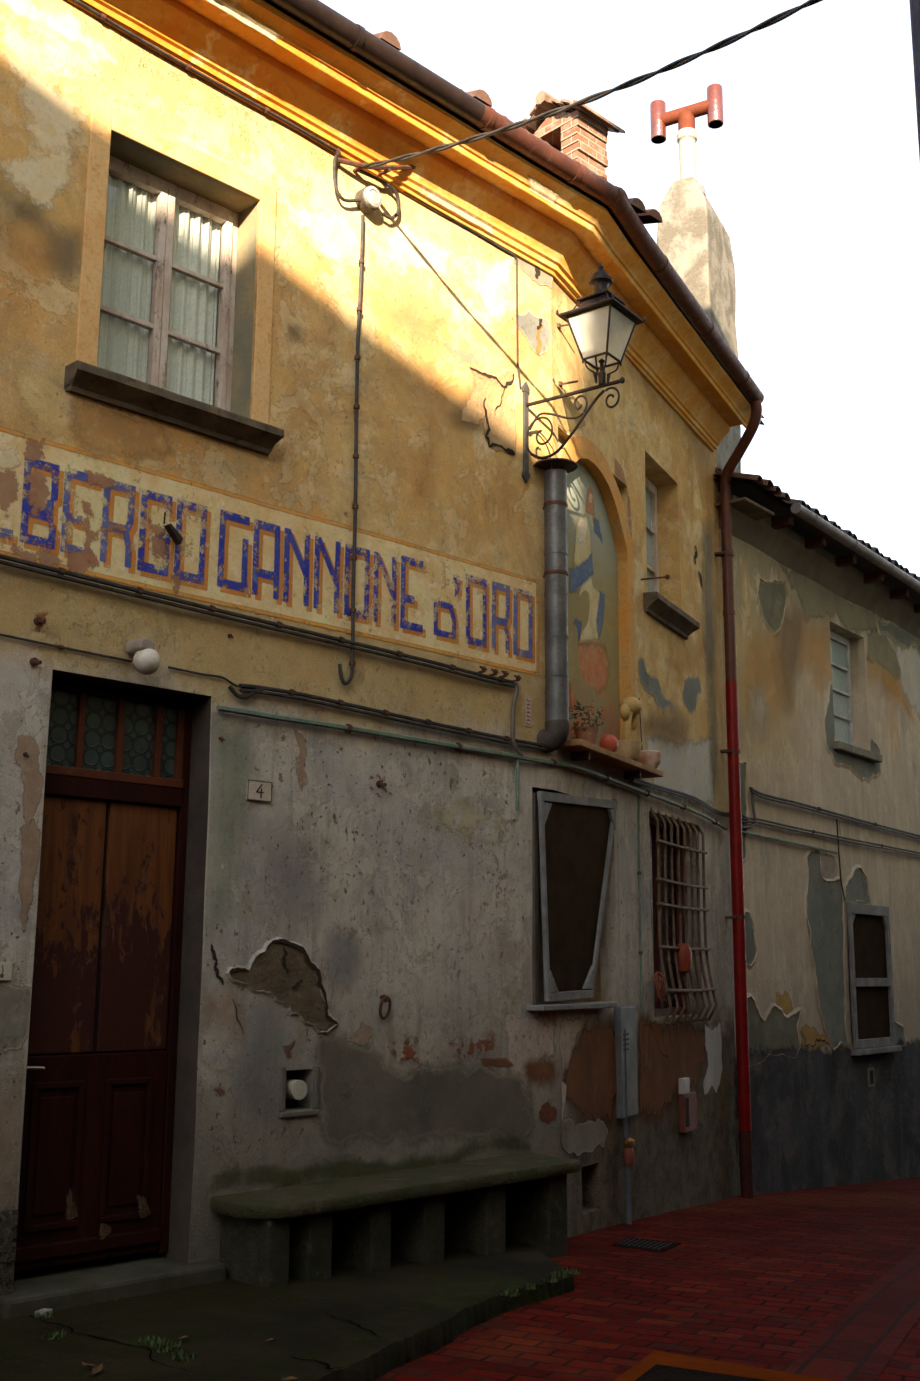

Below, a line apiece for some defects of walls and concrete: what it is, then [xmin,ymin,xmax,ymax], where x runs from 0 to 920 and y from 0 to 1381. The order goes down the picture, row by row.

flaking render [454,367,516,456]
peeling [0,438,50,517]
peeling [11,469,127,574]
peeling [15,735,44,932]
flaking render [225,937,339,1035]